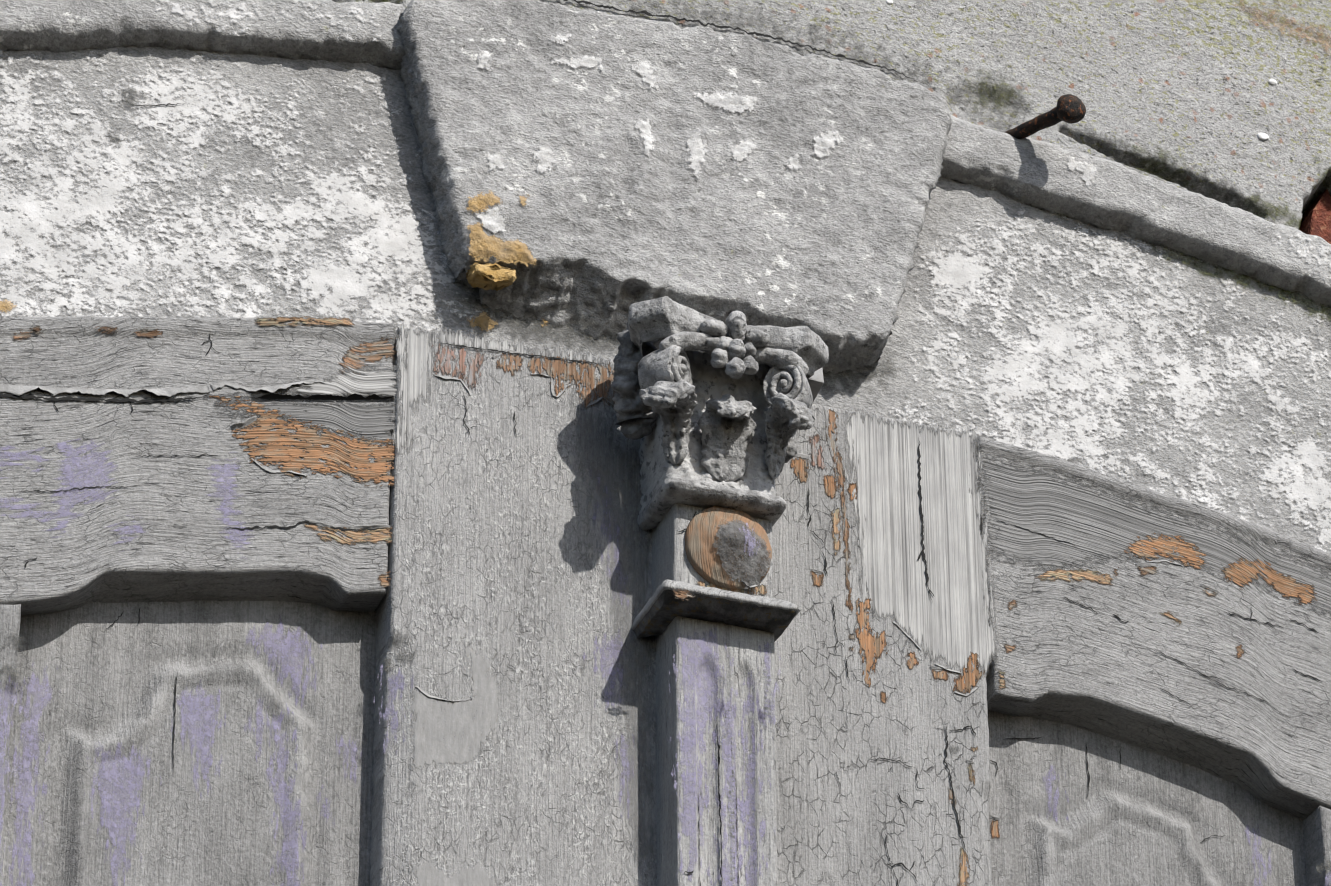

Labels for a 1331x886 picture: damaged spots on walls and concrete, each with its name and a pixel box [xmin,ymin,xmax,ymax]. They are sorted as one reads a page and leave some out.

peeling [0,47,618,489]
flaking render [1060,123,1331,278]
peeling [304,518,393,545]
crack [807,489,850,682]
crack [917,441,935,602]
peeling [790,203,1331,703]
crack [884,832,918,886]
crack [870,724,1041,852]